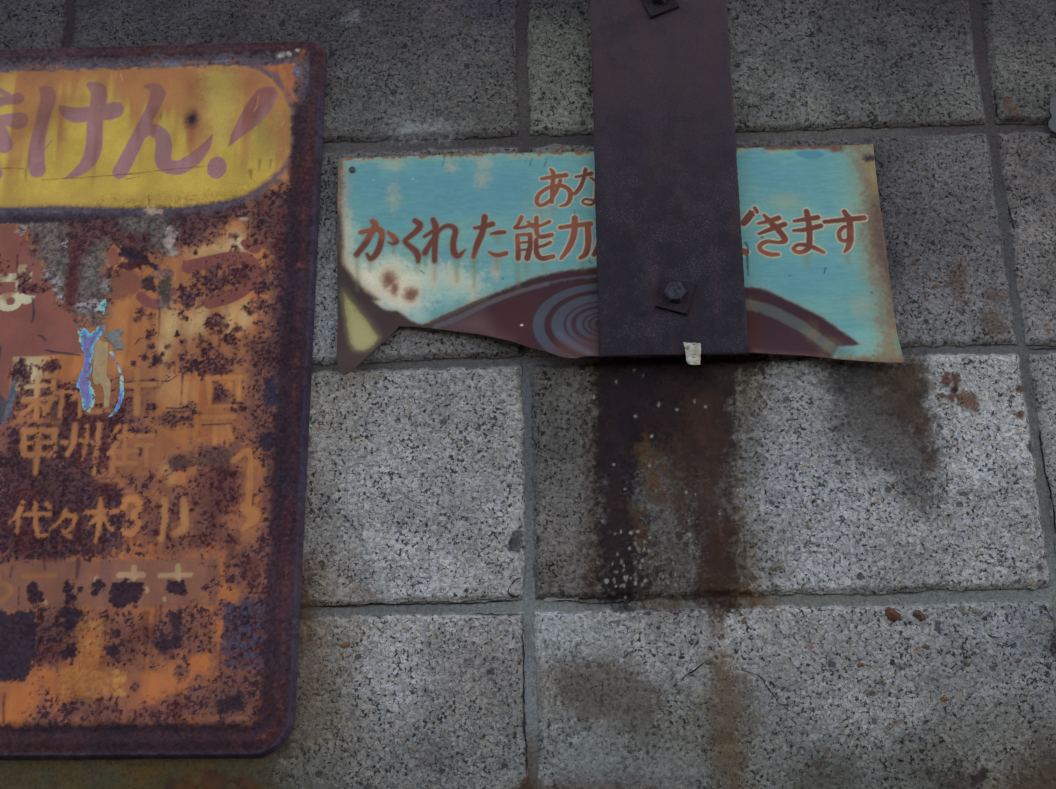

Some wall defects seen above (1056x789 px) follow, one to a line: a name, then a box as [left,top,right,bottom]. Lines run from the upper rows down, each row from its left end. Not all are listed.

corrosion [591,353,768,617]
water stain [830,358,943,511]
corrosion [938,371,979,412]
crack [1039,431,1056,535]